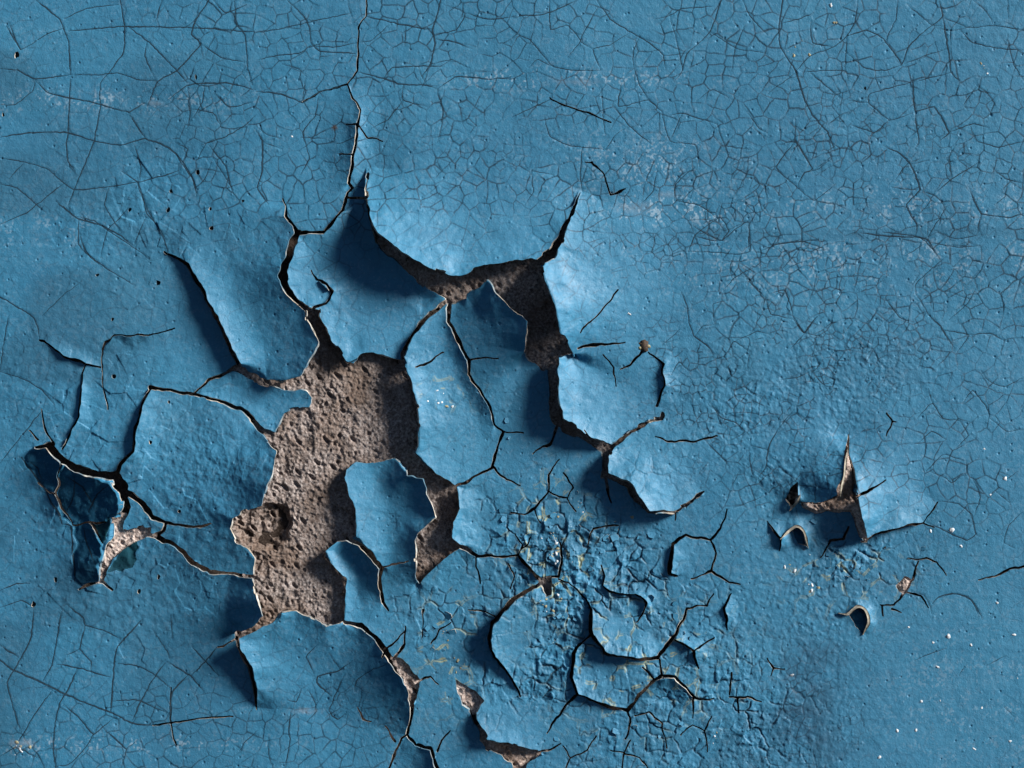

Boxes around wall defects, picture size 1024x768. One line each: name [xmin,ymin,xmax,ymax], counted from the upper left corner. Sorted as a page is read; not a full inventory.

crack [0,583,257,768]
peeling [23,155,719,768]
crack [0,0,1024,591]
crack [241,306,792,768]
spalling [838,605,870,635]
peeling [780,435,937,587]